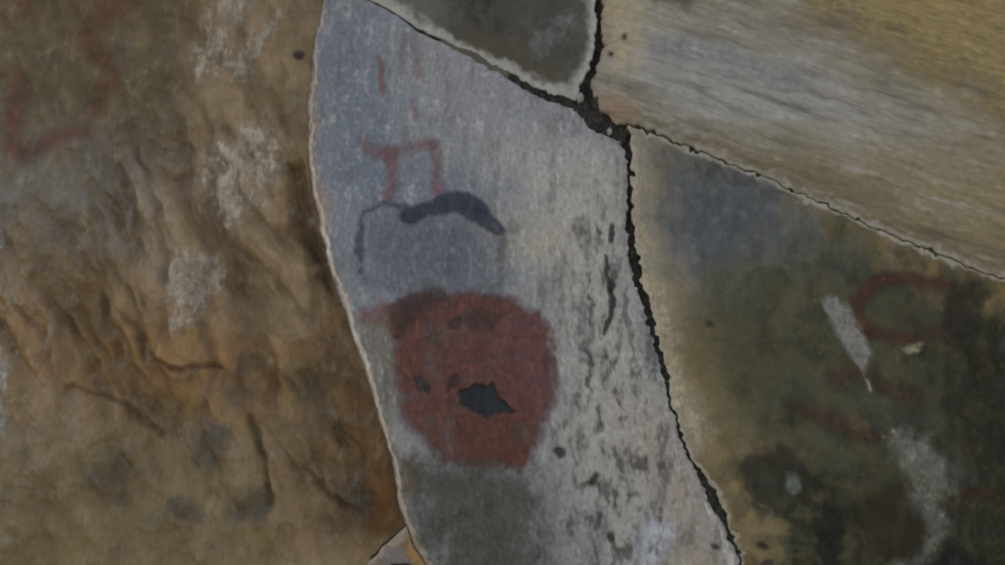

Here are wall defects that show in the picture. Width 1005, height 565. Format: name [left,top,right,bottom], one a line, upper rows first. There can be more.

crack [368,0,441,41]
leakage [309,2,547,565]
crack [508,0,760,565]
leakage [741,282,1005,565]
crack [818,202,1003,279]